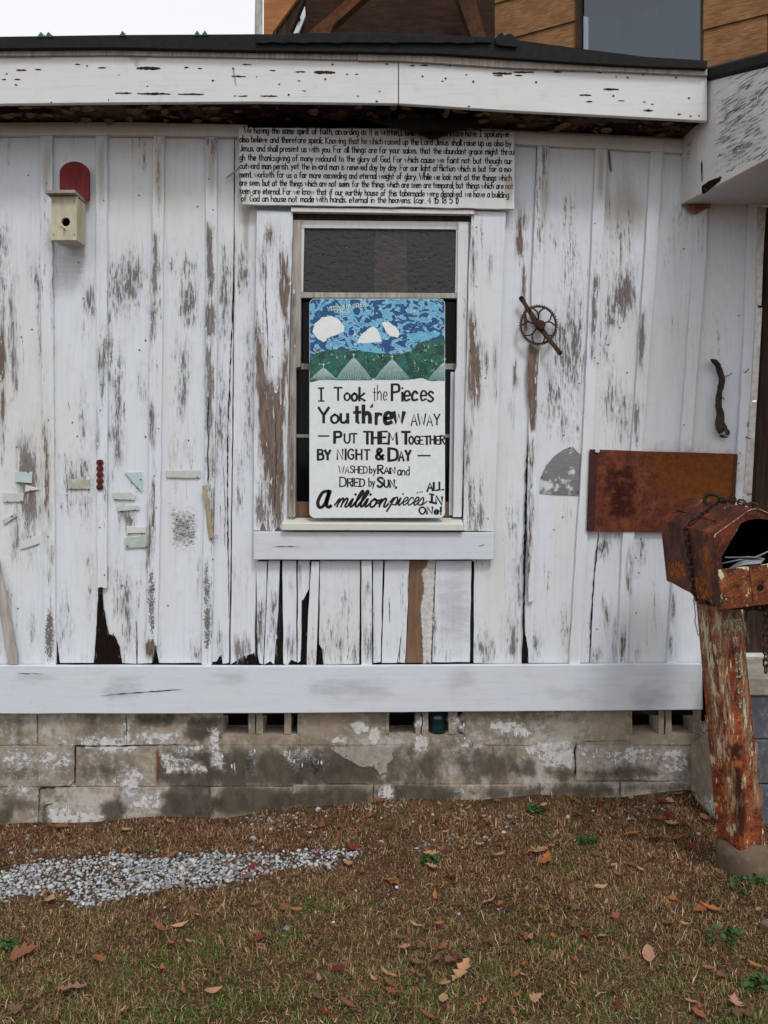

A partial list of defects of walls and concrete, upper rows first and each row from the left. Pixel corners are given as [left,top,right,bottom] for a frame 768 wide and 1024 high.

peeling [2,86,239,125]
peeling [0,226,18,463]
peeling [109,222,296,529]
peeling [465,312,497,407]
peeling [512,212,645,601]
peeling [10,424,89,554]
rust [586,449,738,532]
peeling [147,483,156,648]
rust [668,546,714,600]
peeling [29,604,69,664]
leakage [0,715,688,824]
spalling [331,746,393,774]